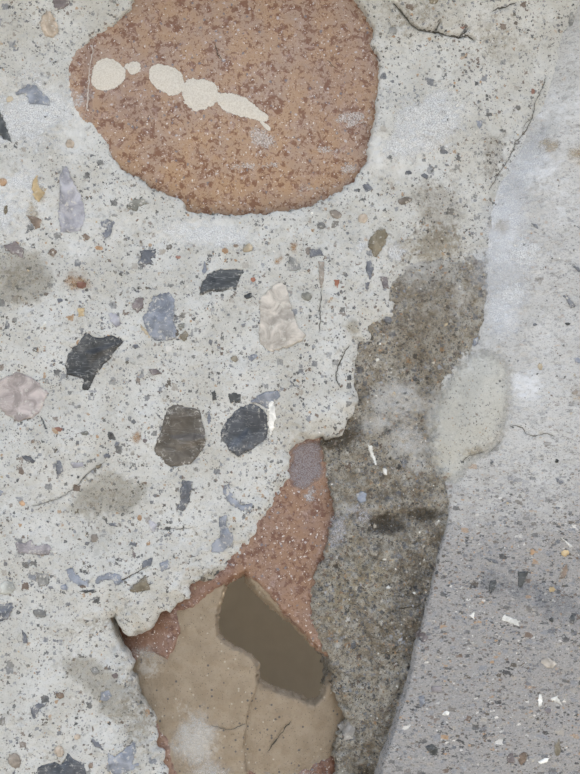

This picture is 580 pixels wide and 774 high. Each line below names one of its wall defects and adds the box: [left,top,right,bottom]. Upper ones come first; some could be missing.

crack [393,3,474,41]
leakage [326,504,403,547]
spalling [310,252,489,774]